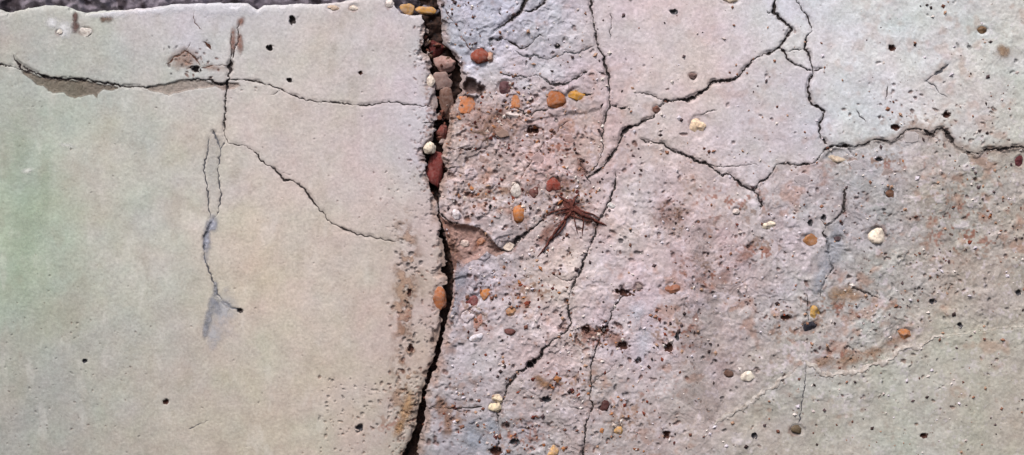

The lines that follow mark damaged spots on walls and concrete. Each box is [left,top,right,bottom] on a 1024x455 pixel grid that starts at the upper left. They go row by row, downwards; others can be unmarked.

spalling [23,71,118,98]
crack [0,55,152,89]
spalling [148,80,240,95]
crack [167,0,488,455]
crack [477,0,1024,455]